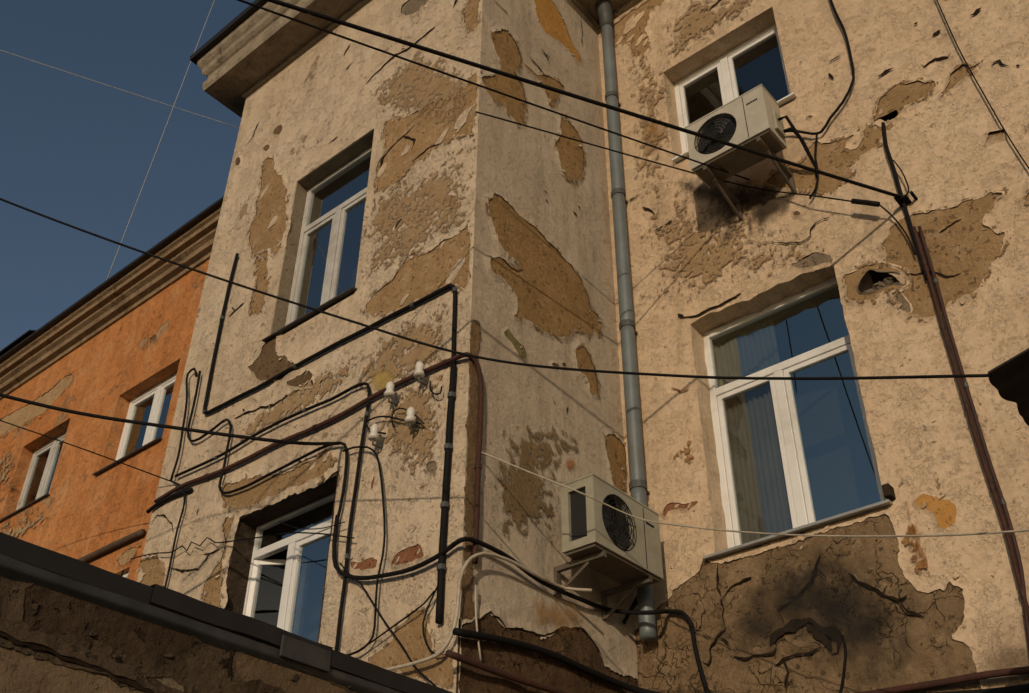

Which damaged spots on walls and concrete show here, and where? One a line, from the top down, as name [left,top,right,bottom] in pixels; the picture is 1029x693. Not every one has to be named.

crack [344,0,457,84]
spalling [613,0,1029,326]
peeling [240,0,605,487]
damp [685,182,792,240]
peeling [0,370,76,507]
peeling [1,505,49,537]
crack [0,617,185,693]
peeling [348,540,429,575]
spalling [364,319,993,693]
crack [702,564,842,689]
crack [797,552,926,618]